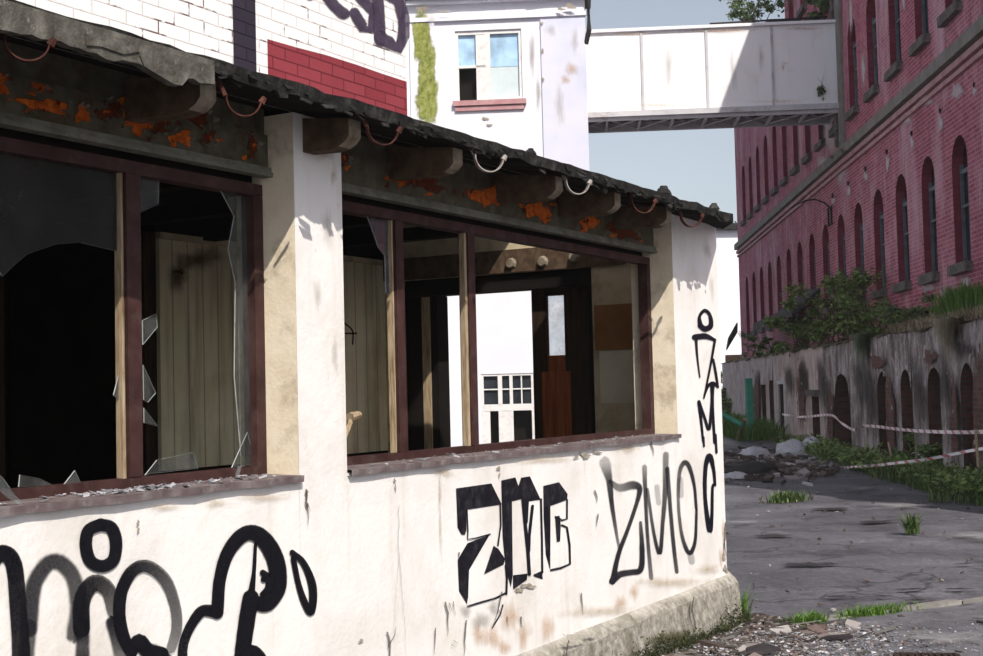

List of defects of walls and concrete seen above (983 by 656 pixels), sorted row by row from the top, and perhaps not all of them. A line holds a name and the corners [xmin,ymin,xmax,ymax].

rust [0,73,223,147]
rust [384,176,501,208]
rust [518,202,557,225]
rust [578,216,643,242]
leakage [785,366,807,399]
flaking render [969,343,983,473]